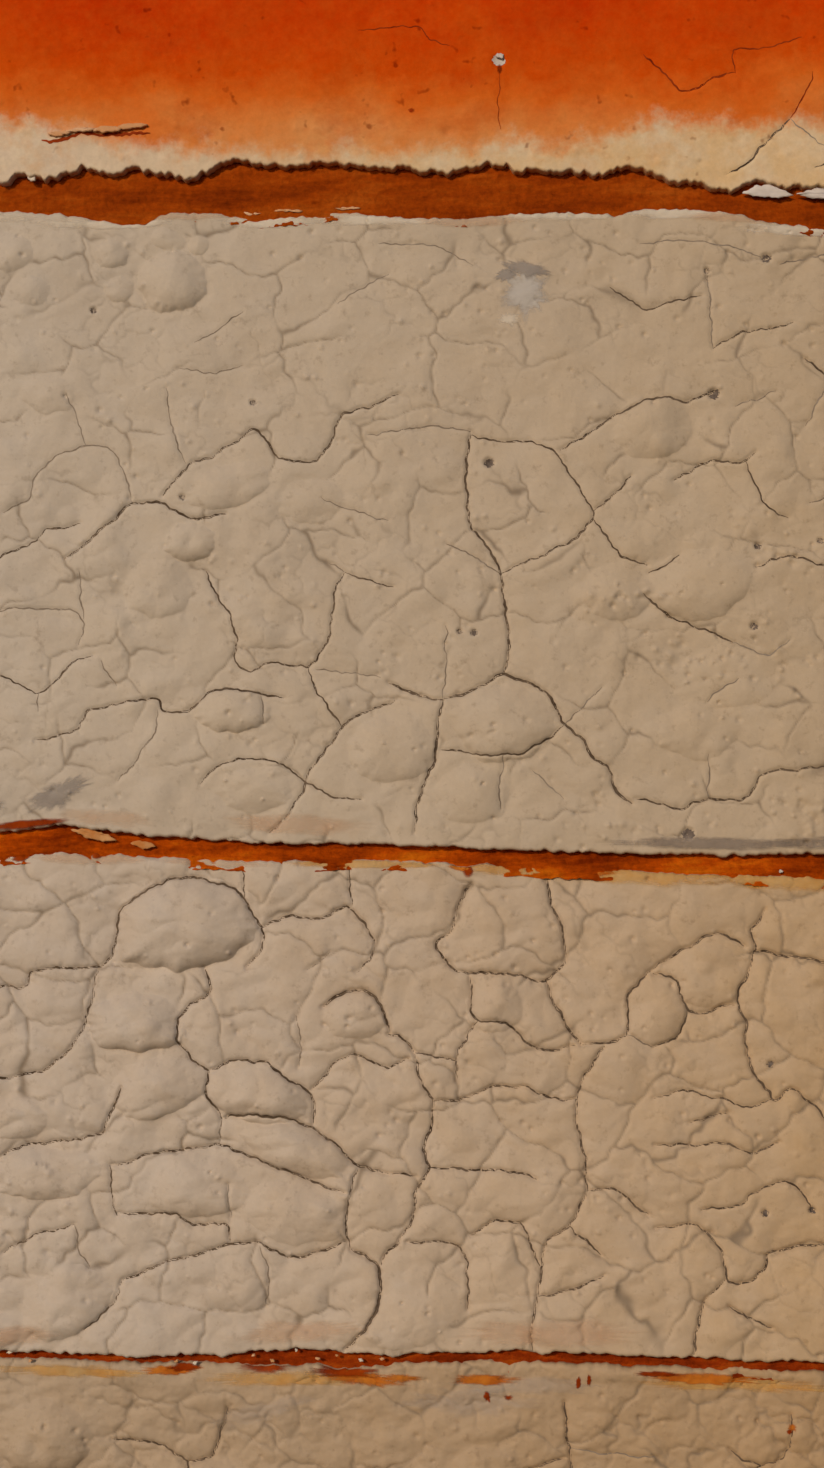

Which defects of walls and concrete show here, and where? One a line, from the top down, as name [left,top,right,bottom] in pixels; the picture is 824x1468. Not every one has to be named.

crack [643,37,800,92]
peeling [42,123,150,144]
crack [729,71,824,173]
peeling [0,163,824,237]
crack [610,239,824,349]
crack [0,313,824,833]
corrosion [0,819,824,889]
crack [0,870,824,1352]
corrosion [0,1347,824,1402]
crack [112,1408,228,1468]
crack [528,1402,655,1468]
crack [731,1415,793,1468]